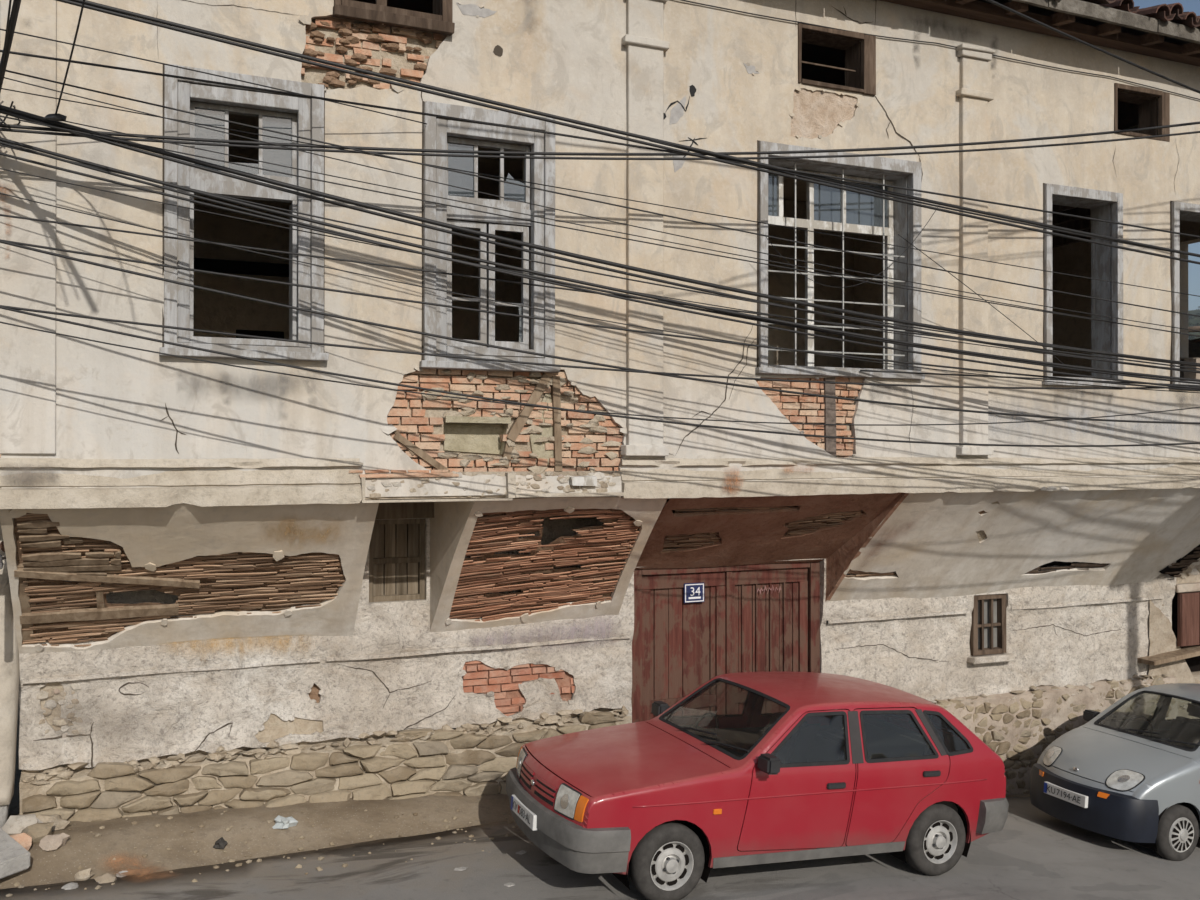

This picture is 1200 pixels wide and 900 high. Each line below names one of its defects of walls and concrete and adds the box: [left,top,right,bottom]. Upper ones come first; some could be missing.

spalling [299,15,447,93]
crack [875,96,923,176]
crack [160,403,186,454]
crack [669,326,755,456]
spalling [752,375,868,457]
spalling [349,366,642,625]
spalling [9,509,345,652]
spalling [1148,600,1195,683]
crack [33,722,94,769]
crack [194,723,233,752]
crack [344,665,456,730]
spalling [458,660,575,716]